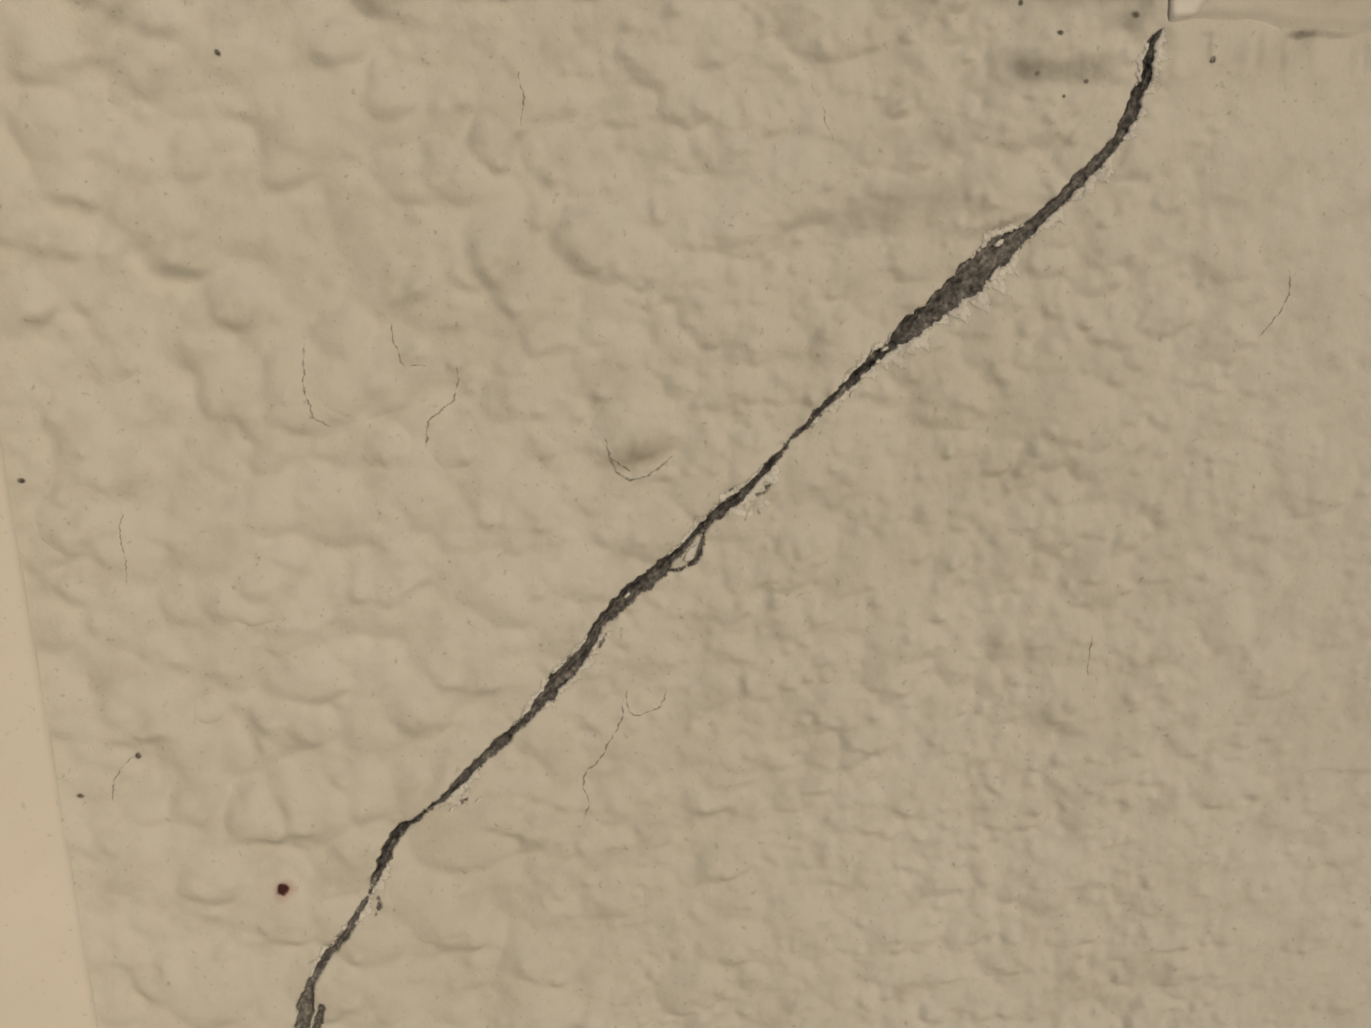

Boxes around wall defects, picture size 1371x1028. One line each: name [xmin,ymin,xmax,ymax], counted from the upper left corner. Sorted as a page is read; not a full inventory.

crack [295,28,1173,1028]